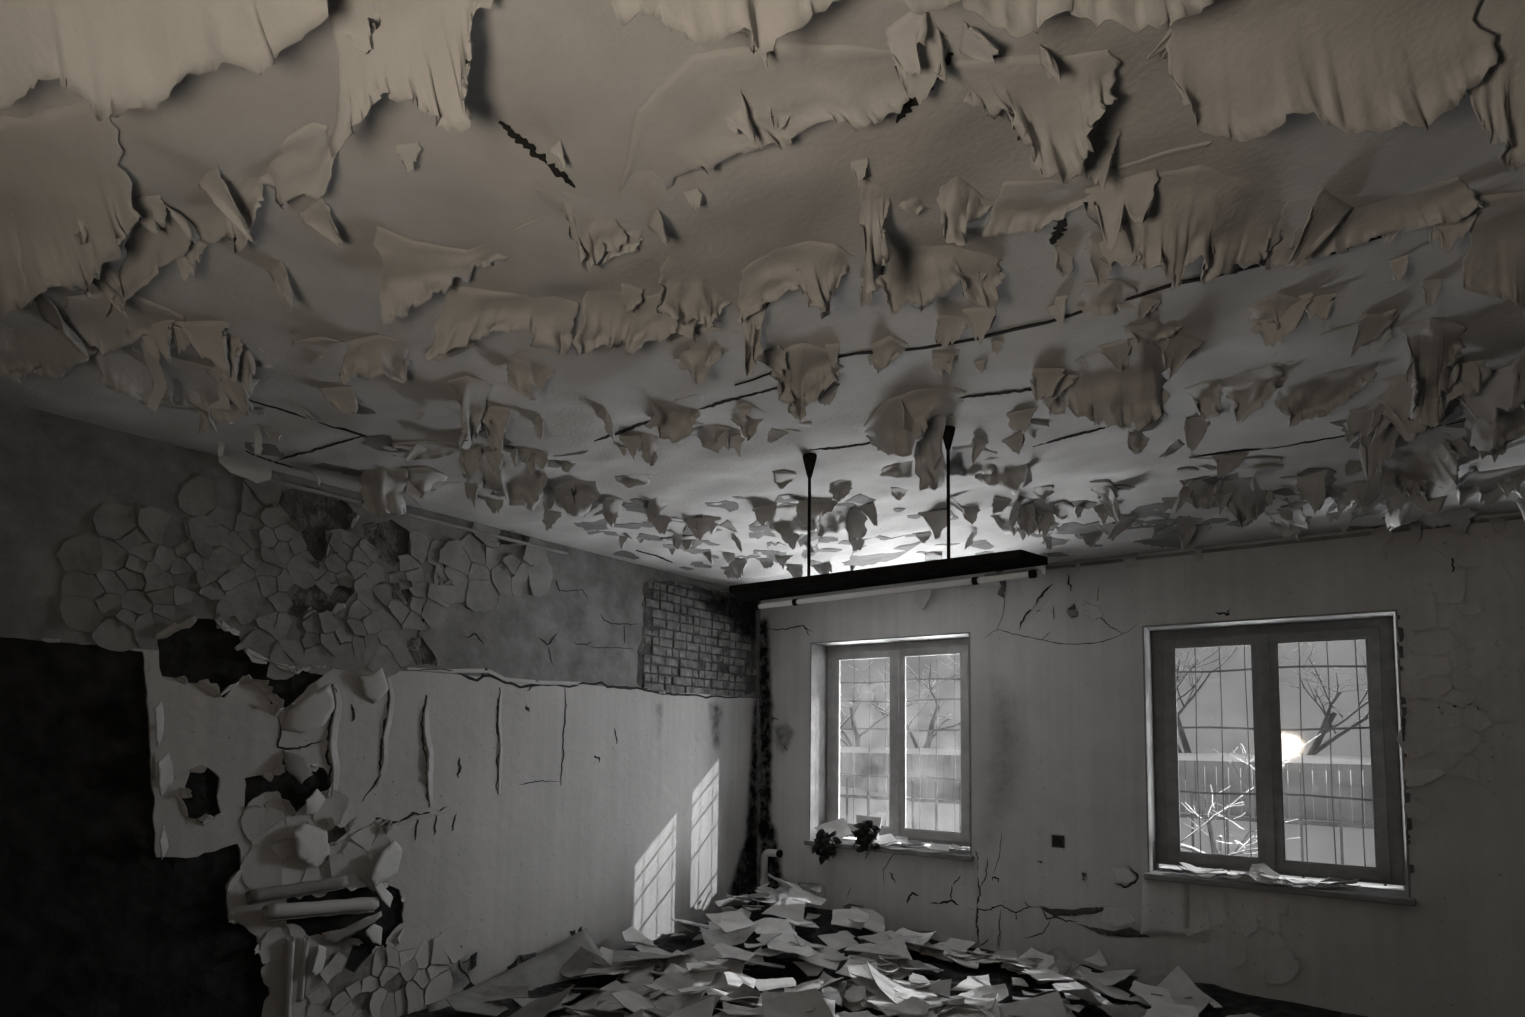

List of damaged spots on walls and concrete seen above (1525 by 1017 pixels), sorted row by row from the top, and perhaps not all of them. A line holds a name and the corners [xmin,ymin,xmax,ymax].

peeling [0,0,494,458]
peeling [549,140,566,170]
peeling [320,190,854,488]
peeling [864,279,1525,575]
crack [277,582,787,840]
spalling [0,375,1223,1017]
crack [988,574,1132,645]
crack [797,835,1077,948]
crack [1117,865,1139,888]